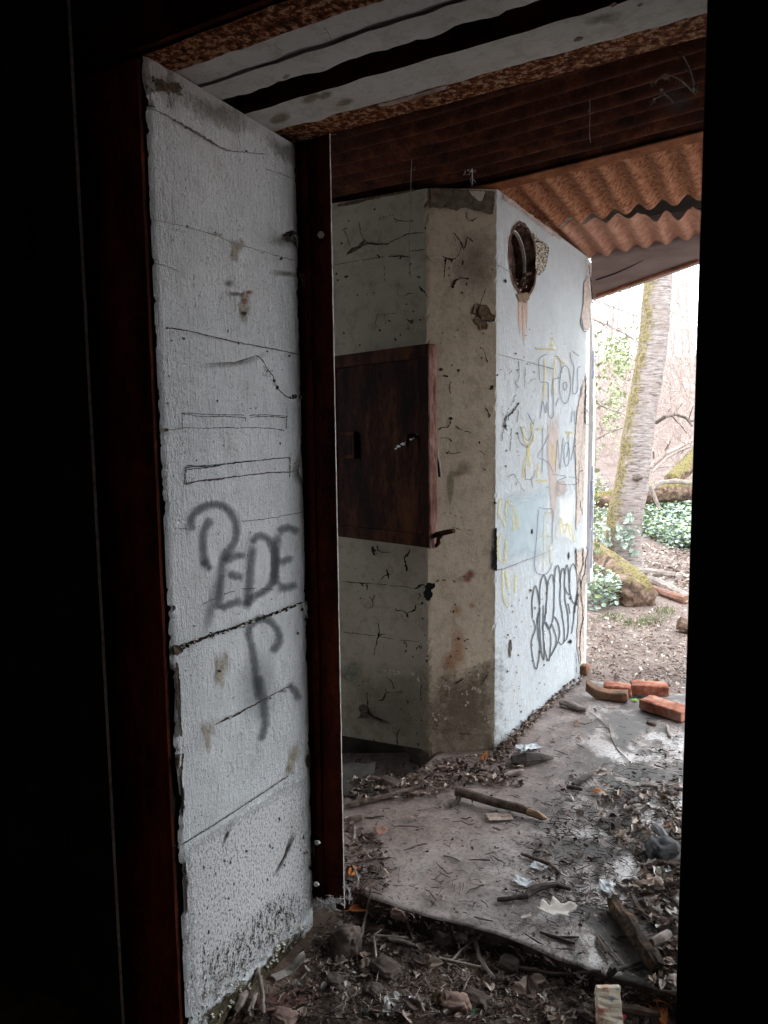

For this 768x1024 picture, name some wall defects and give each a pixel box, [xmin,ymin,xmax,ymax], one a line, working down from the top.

crack [148,107,288,177]
crack [335,213,478,330]
crack [166,327,299,355]
spalling [473,289,496,334]
rust [516,292,530,339]
crack [175,588,308,653]
crack [344,546,422,653]
crack [215,686,291,725]
damp [424,666,499,752]
crack [182,776,288,845]